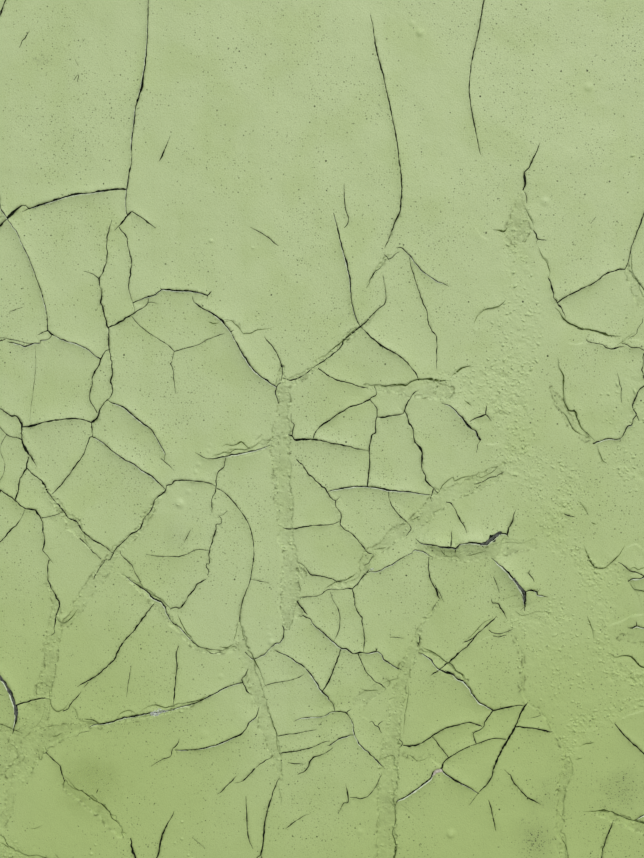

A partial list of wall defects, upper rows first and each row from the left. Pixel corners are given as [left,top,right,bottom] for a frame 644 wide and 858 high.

crack [523,144,540,199]
crack [548,213,644,444]
crack [0,0,516,810]
peeling [329,360,644,732]
crack [613,557,644,582]
crack [391,559,552,830]
crack [130,812,174,858]
crack [246,779,279,858]
peeling [375,764,399,858]